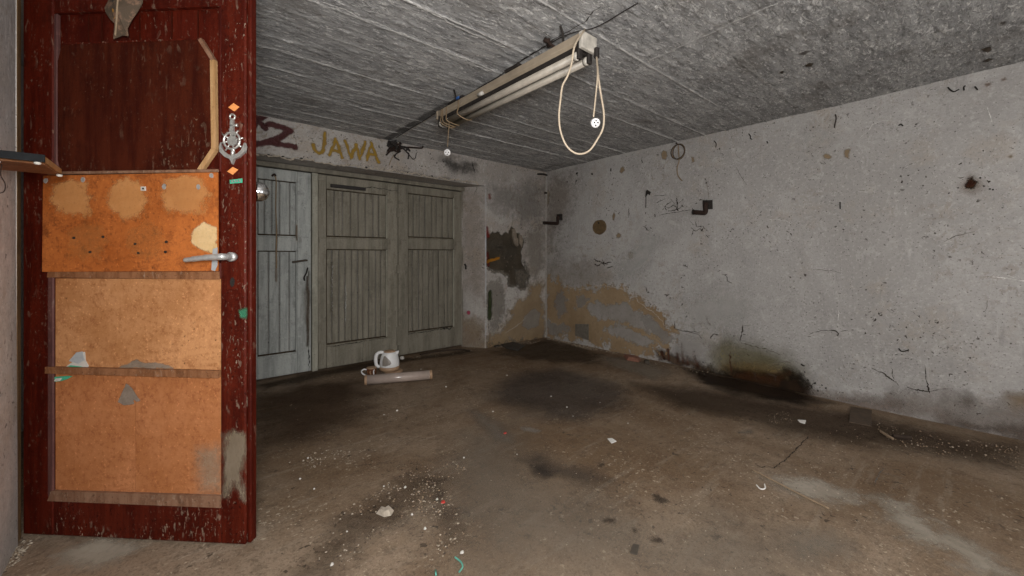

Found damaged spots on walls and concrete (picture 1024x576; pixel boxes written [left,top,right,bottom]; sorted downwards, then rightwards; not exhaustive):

peeling [486,227,680,359]
leakage [646,342,1024,462]